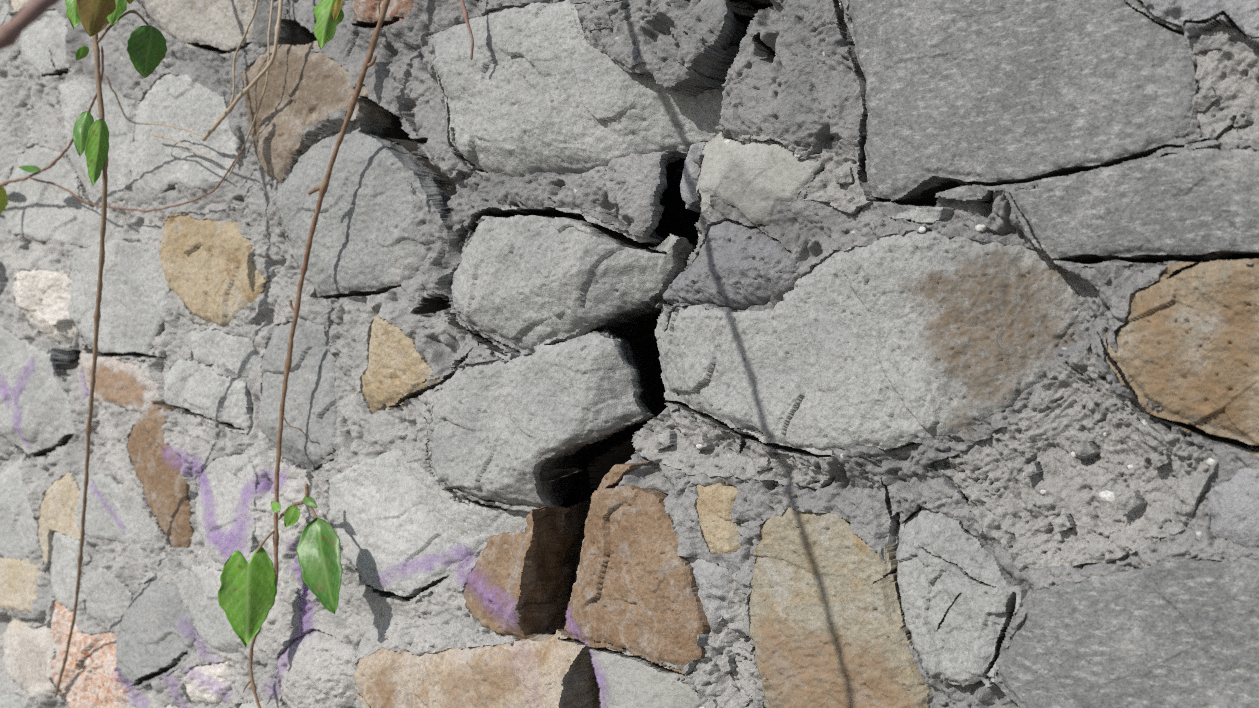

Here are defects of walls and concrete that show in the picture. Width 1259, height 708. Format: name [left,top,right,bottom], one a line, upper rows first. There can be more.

crack [741,4,771,12]
crack [834,0,866,84]
crack [858,115,1259,278]
crack [624,322,658,346]
crack [540,440,636,581]
crack [559,637,685,675]